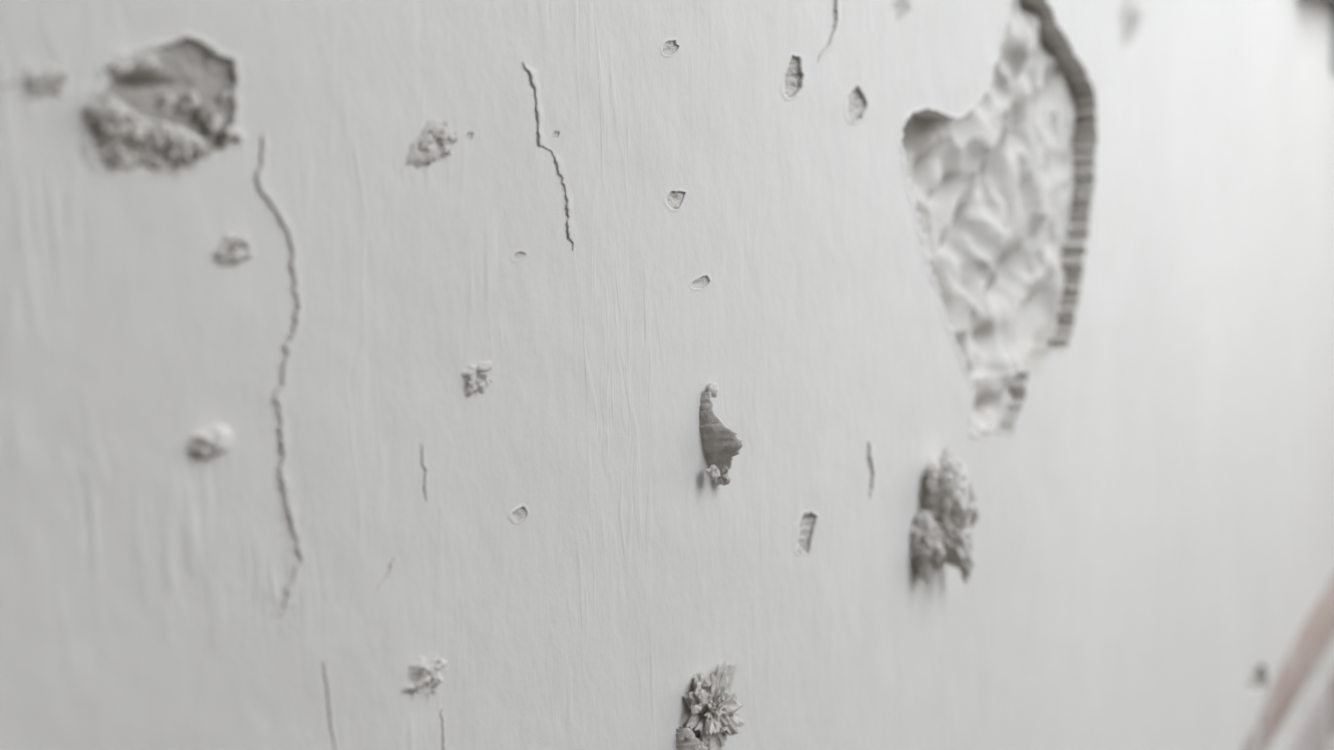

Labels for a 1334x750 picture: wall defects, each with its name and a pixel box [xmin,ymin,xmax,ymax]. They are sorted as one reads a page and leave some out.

spalling [22,63,70,101]
spalling [75,29,249,181]
spalling [405,119,473,169]
crack [521,62,580,251]
crack [816,0,843,63]
spalling [896,0,1101,442]
crack [252,133,308,620]
peeling [699,382,744,486]
flaking render [676,660,746,750]